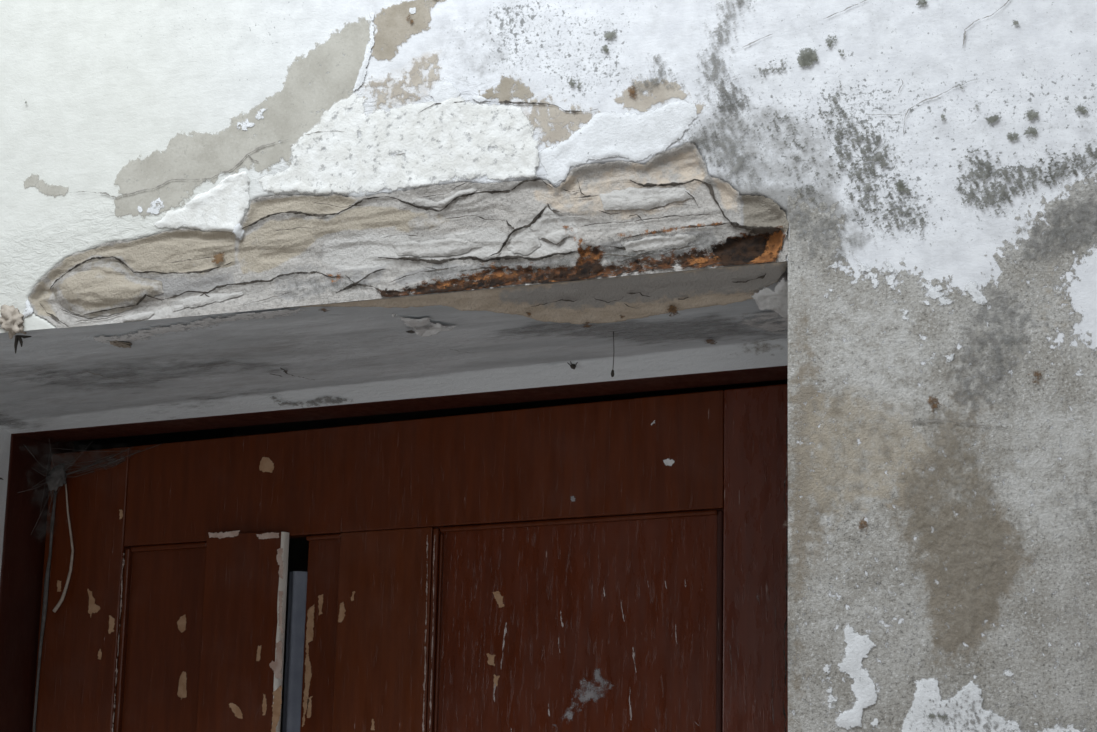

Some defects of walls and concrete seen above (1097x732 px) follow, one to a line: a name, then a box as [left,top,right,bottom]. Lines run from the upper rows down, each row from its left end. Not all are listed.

leakage [633,55,685,91]
crack [74,131,345,198]
flaking render [22,0,789,328]
leakage [678,0,935,259]
leakage [954,110,1097,217]
crack [40,179,780,327]
rust [378,225,786,297]
peeling [93,308,301,343]
peeling [391,314,456,337]
peeling [742,172,1097,732]